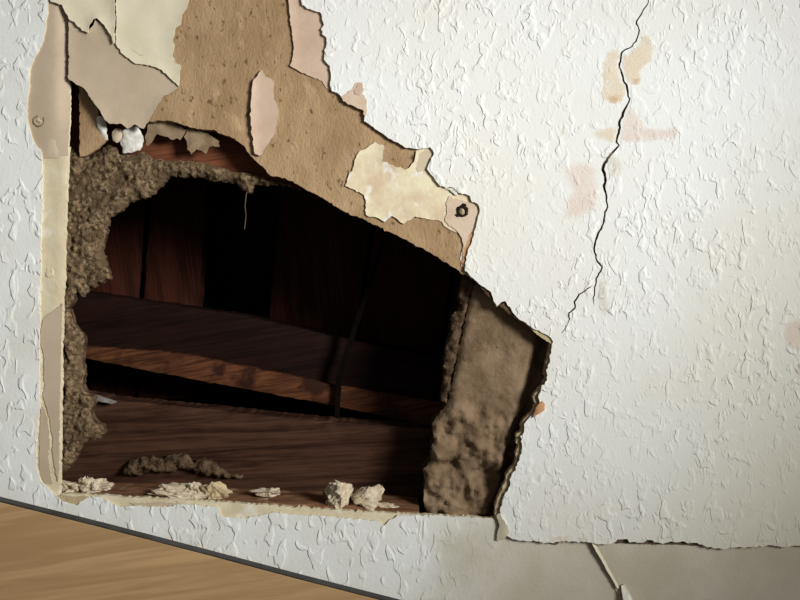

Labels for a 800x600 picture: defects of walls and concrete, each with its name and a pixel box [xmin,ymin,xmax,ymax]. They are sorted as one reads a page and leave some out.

peeling [50,0,189,154]
peeling [250,70,279,156]
peeling [288,0,367,118]
crack [561,2,649,334]
flaking render [37,142,553,528]